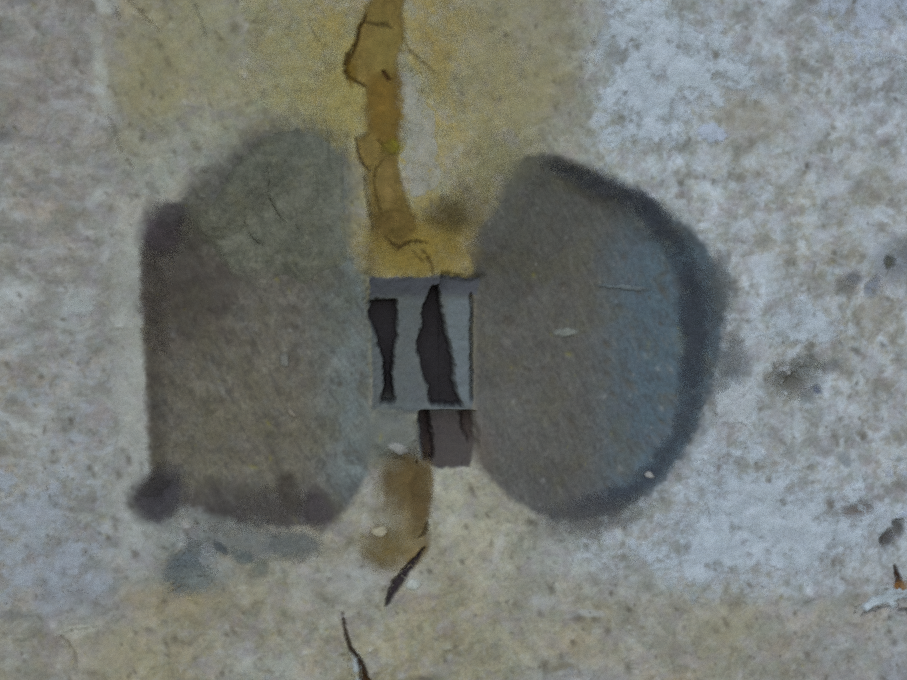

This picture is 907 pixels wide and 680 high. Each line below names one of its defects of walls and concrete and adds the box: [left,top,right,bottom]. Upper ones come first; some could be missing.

crack [344,0,429,260]
peeling [389,443,408,455]
crack [386,459,432,605]
crack [343,621,369,680]